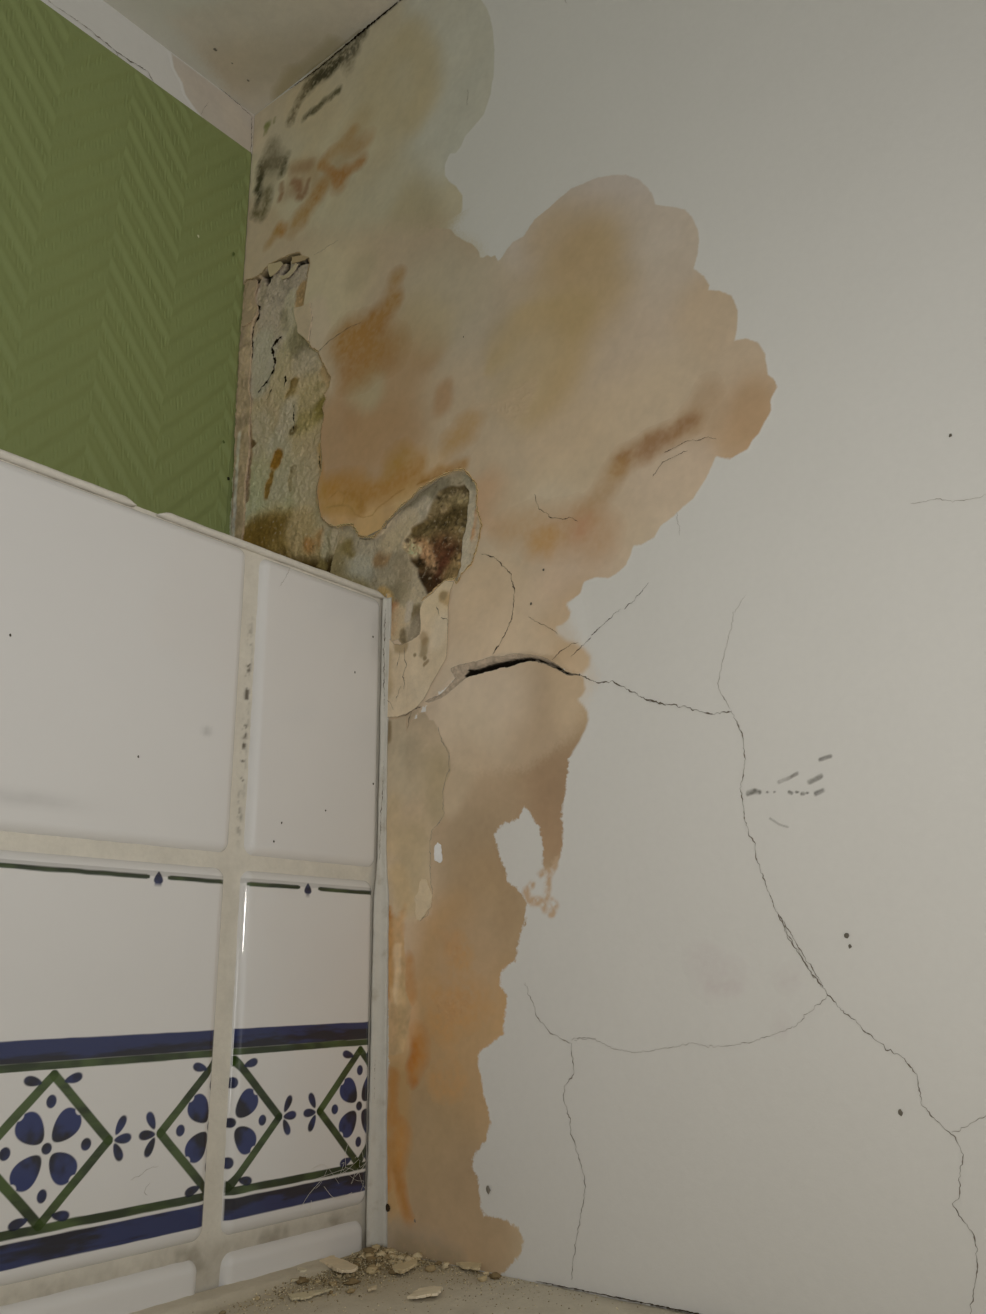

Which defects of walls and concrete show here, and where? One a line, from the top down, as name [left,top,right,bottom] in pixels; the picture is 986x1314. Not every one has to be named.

spalling [229,252,483,1058]
water stain [143,0,781,599]
water stain [387,756,572,1275]
crack [387,555,986,1314]